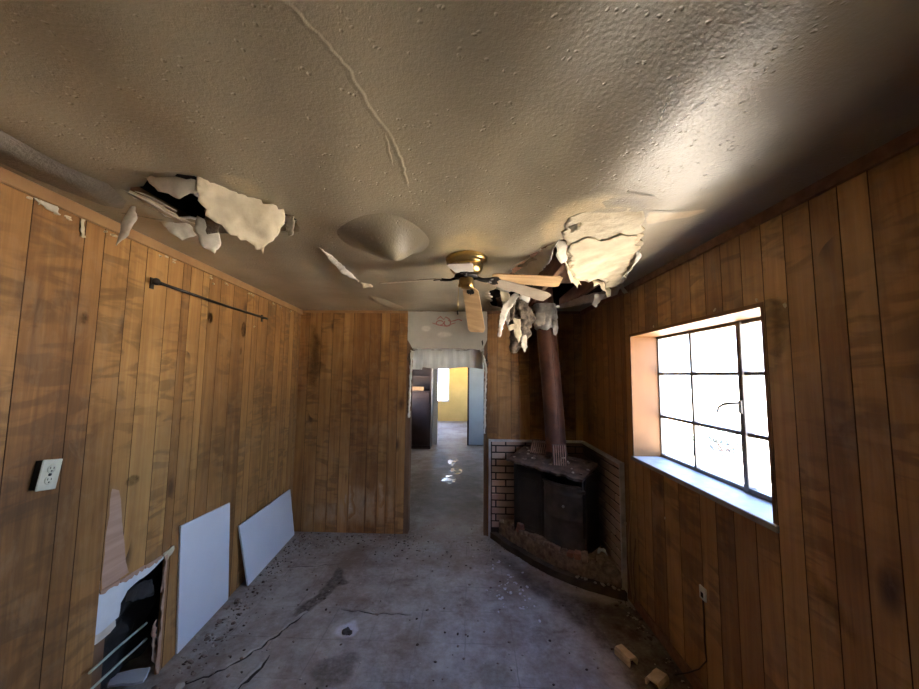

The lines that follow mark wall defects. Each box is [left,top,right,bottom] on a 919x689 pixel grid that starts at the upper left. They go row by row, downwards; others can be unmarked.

crack [276,0,409,187]
hole [91,545,175,689]
crack [167,611,308,689]